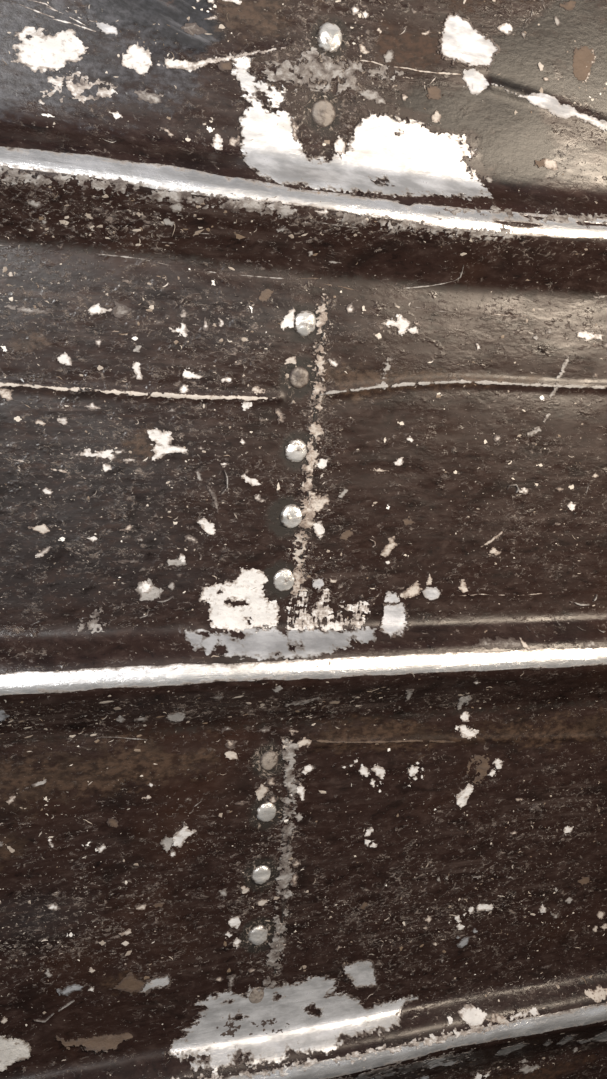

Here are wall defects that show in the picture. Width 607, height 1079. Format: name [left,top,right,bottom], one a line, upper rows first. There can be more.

peeling [96,22,118,36]
peeling [11,26,123,119]
peeling [121,42,162,104]
peeling [211,42,607,243]
peeling [0,165,297,232]
peeling [184,567,441,662]
peeling [54,1032,133,1054]
peeling [113,972,173,996]
peeling [167,945,541,1079]